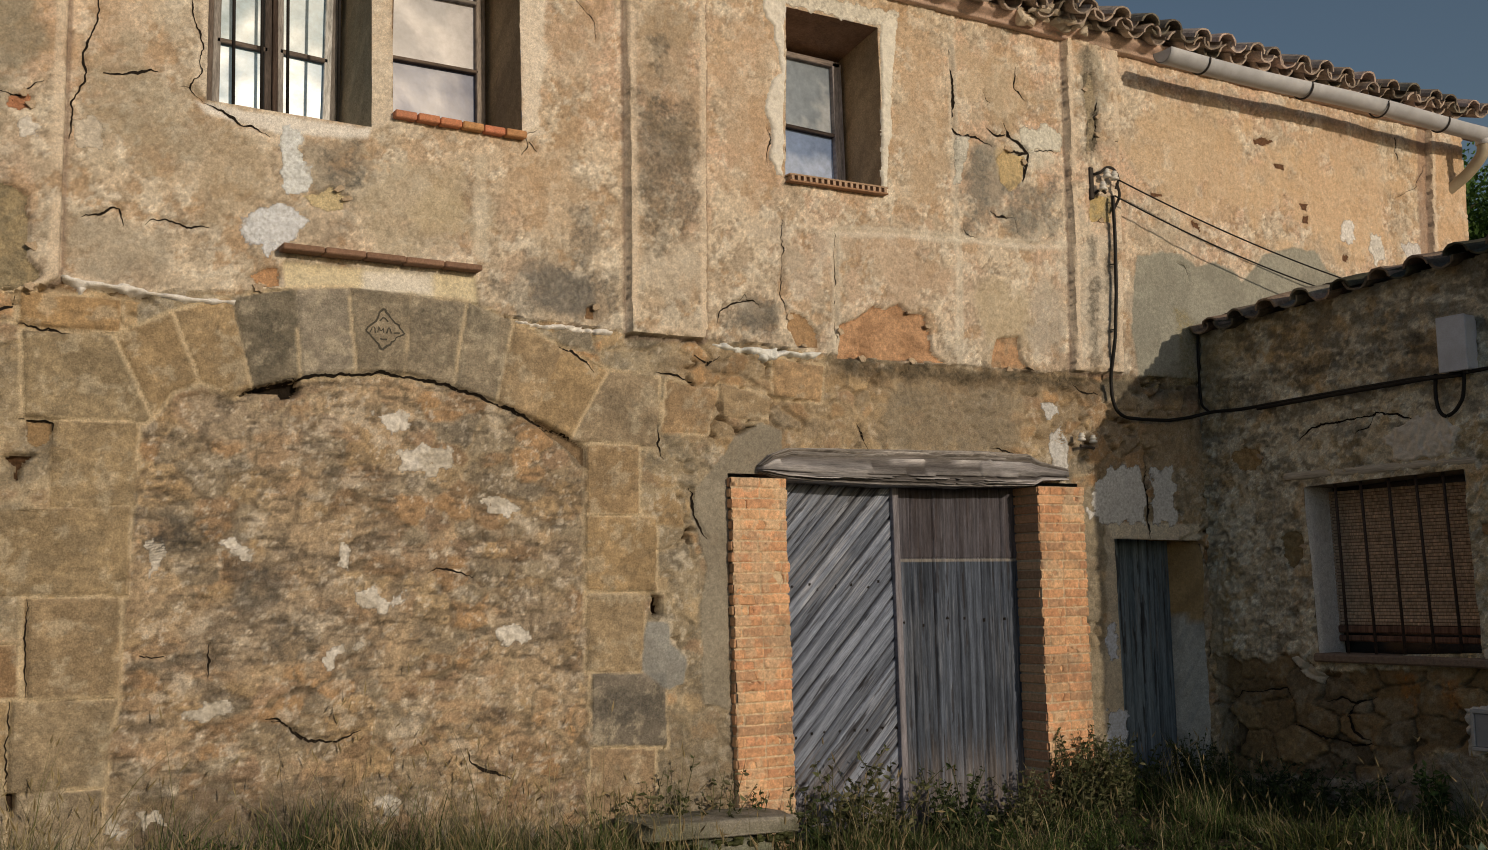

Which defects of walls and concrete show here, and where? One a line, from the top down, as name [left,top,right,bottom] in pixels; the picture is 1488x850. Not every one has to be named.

crack [0,0,270,137]
crack [948,49,1054,182]
spalling [0,183,41,291]
crack [81,206,209,229]
crack [964,212,1018,238]
spalling [786,312,817,348]
spalling [837,304,943,365]
spalling [991,337,1035,371]
crack [1297,411,1412,442]